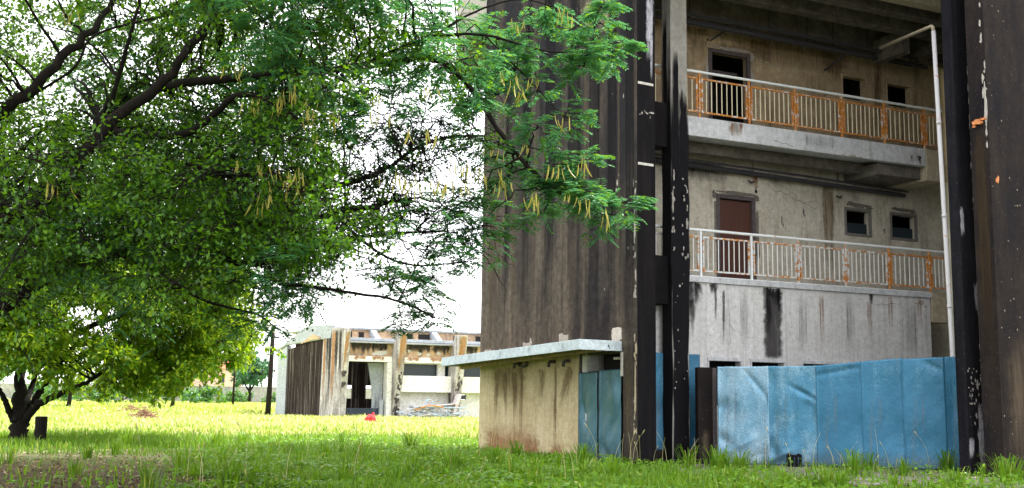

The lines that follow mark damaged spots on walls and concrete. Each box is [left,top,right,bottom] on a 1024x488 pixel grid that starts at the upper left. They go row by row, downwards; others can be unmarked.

spalling [967,61,992,148]
peeling [671,169,689,259]
damp [689,282,725,325]
damp [763,288,782,358]